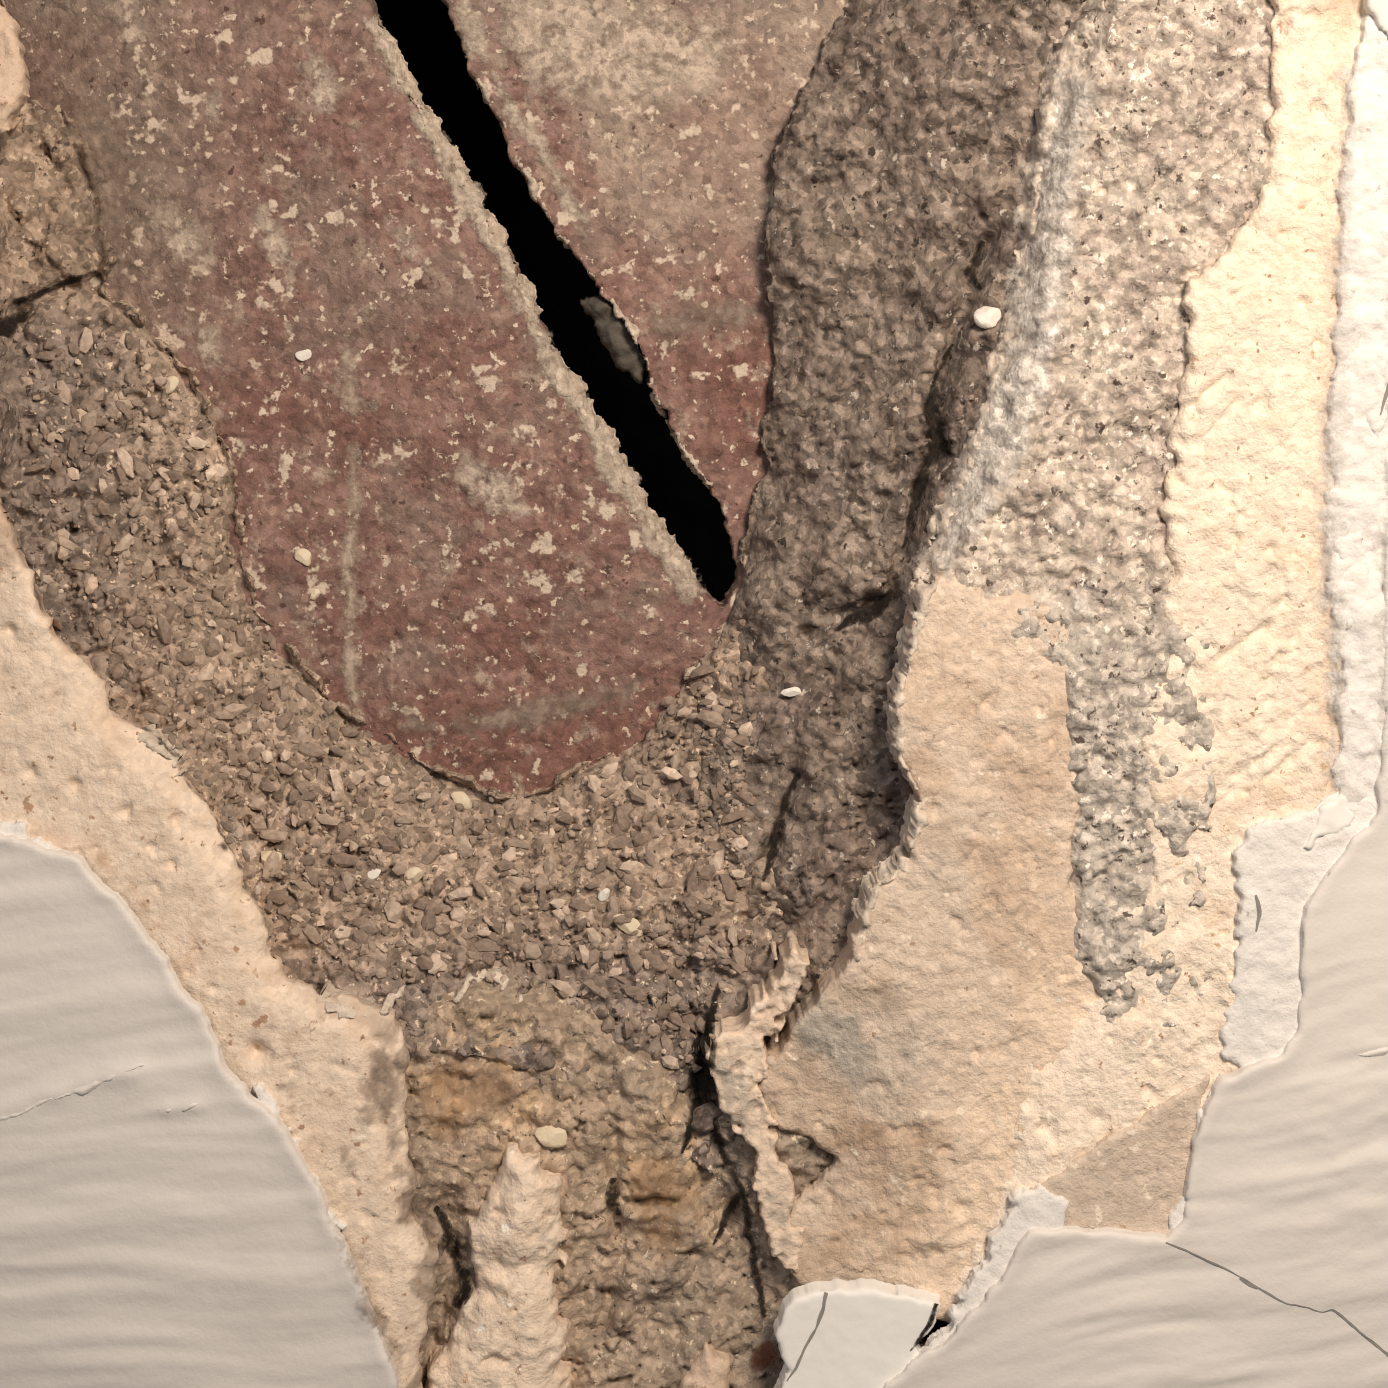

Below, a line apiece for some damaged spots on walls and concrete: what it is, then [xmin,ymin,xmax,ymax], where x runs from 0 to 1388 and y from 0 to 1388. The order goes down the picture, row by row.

crack [363,0,737,605]
crack [1380,385,1388,415]
spalling [0,0,1069,1388]
spalling [678,0,1388,1323]
crack [681,986,767,1317]
crack [786,1292,828,1381]
crack [1166,1242,1388,1356]